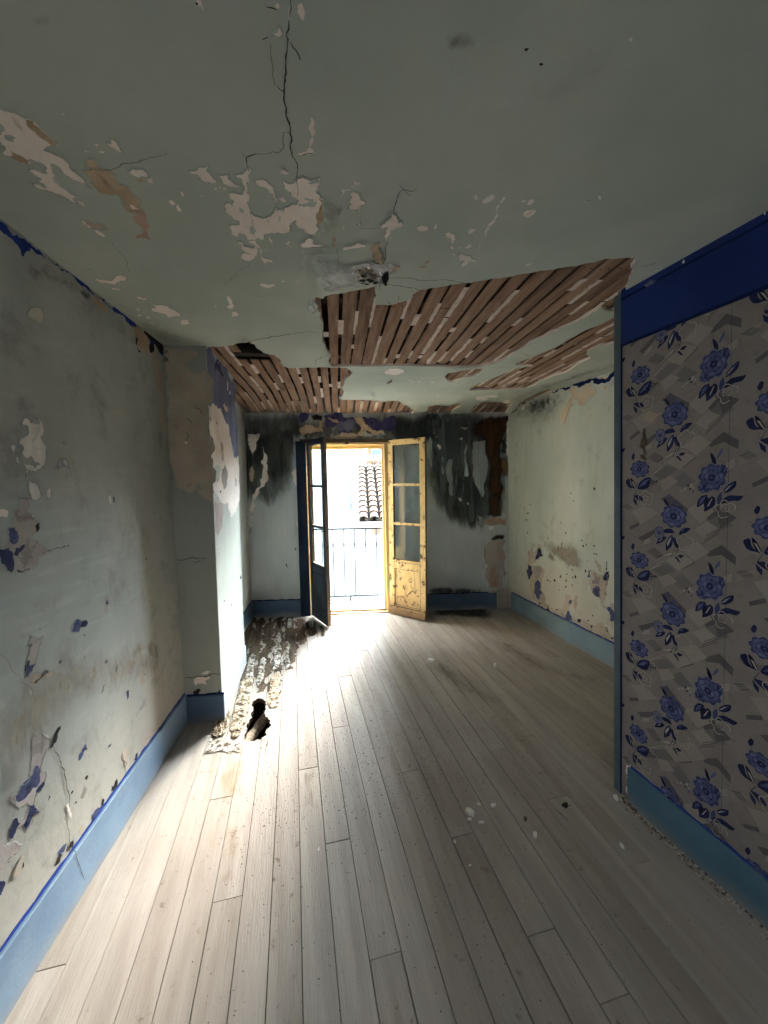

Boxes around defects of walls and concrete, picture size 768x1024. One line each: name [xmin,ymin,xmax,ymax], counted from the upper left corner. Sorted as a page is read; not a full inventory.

crack [243,0,301,178]
peeling [0,107,153,239]
flaking render [164,164,635,536]
peeling [11,416,51,517]
damp [244,412,508,528]
spalling [483,517,510,609]